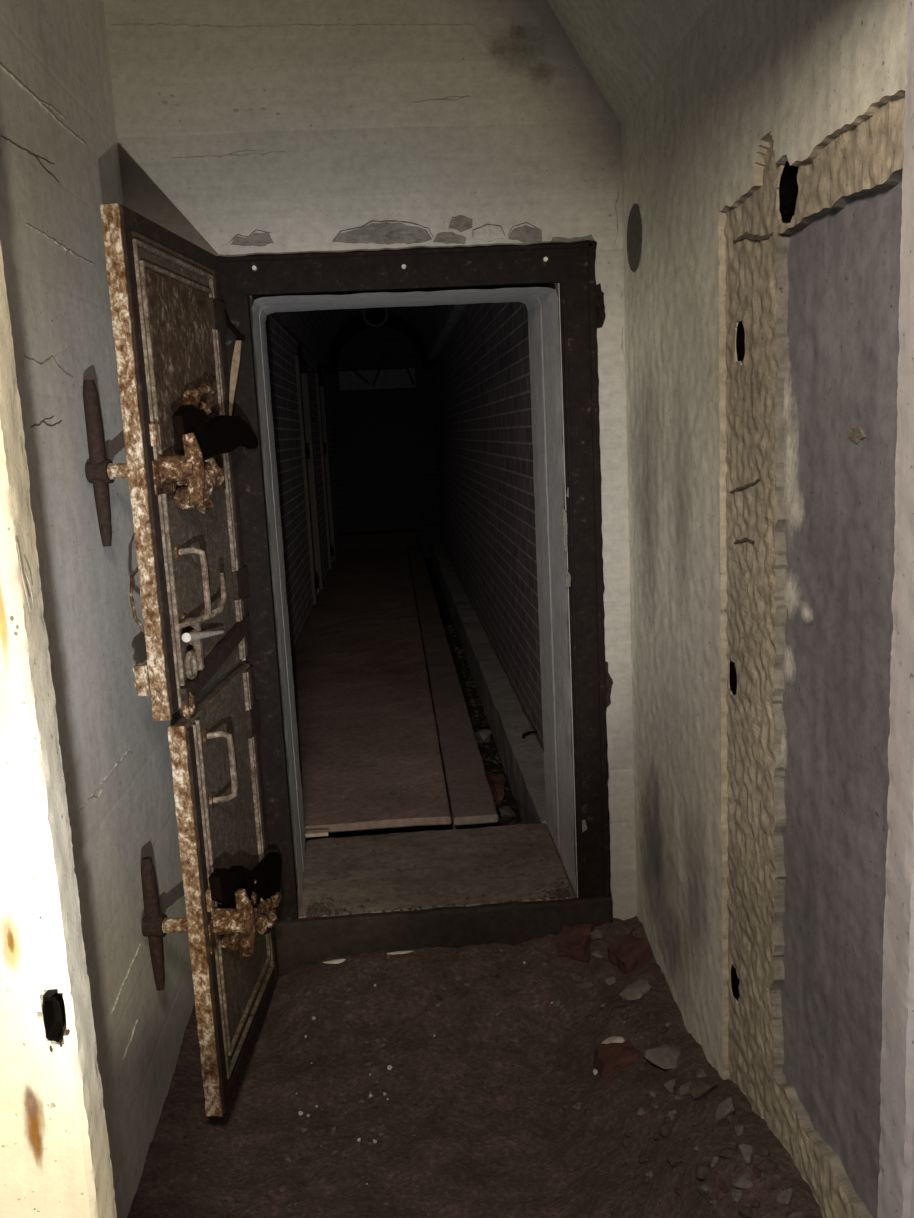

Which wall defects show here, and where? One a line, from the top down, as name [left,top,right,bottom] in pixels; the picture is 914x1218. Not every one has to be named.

spalling [333,215,597,248]
corrosion [27,1093,40,1158]